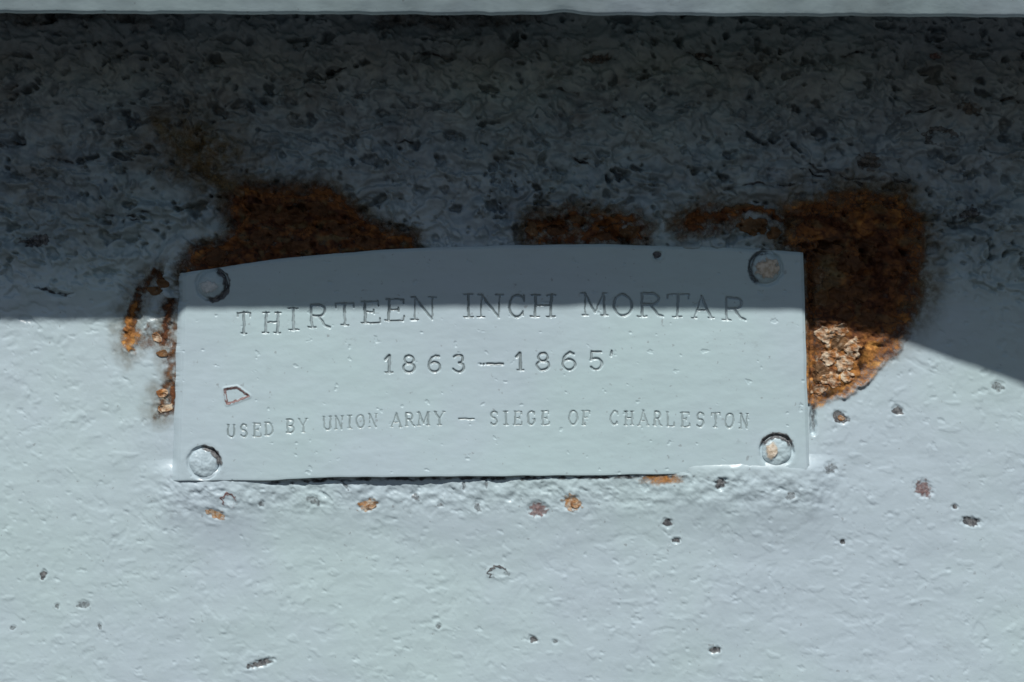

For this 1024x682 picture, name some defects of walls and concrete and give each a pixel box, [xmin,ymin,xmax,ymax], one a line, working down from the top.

corrosion [518,201,653,245]
corrosion [122,117,419,417]
corrosion [669,183,938,406]
peeling [833,410,849,423]
corrosion [643,475,680,484]
peeling [915,479,931,497]
peeling [953,504,980,527]
peeling [247,658,272,669]